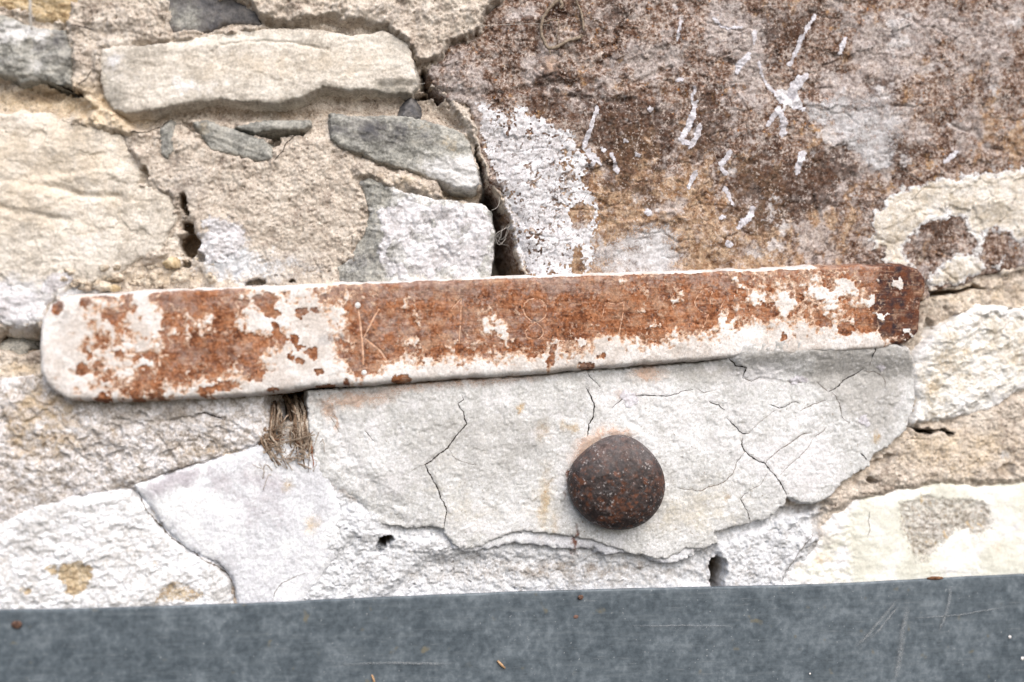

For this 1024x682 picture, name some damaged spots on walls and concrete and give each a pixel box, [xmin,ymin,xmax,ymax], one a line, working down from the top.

crack [417,378,476,526]
crack [566,348,885,523]